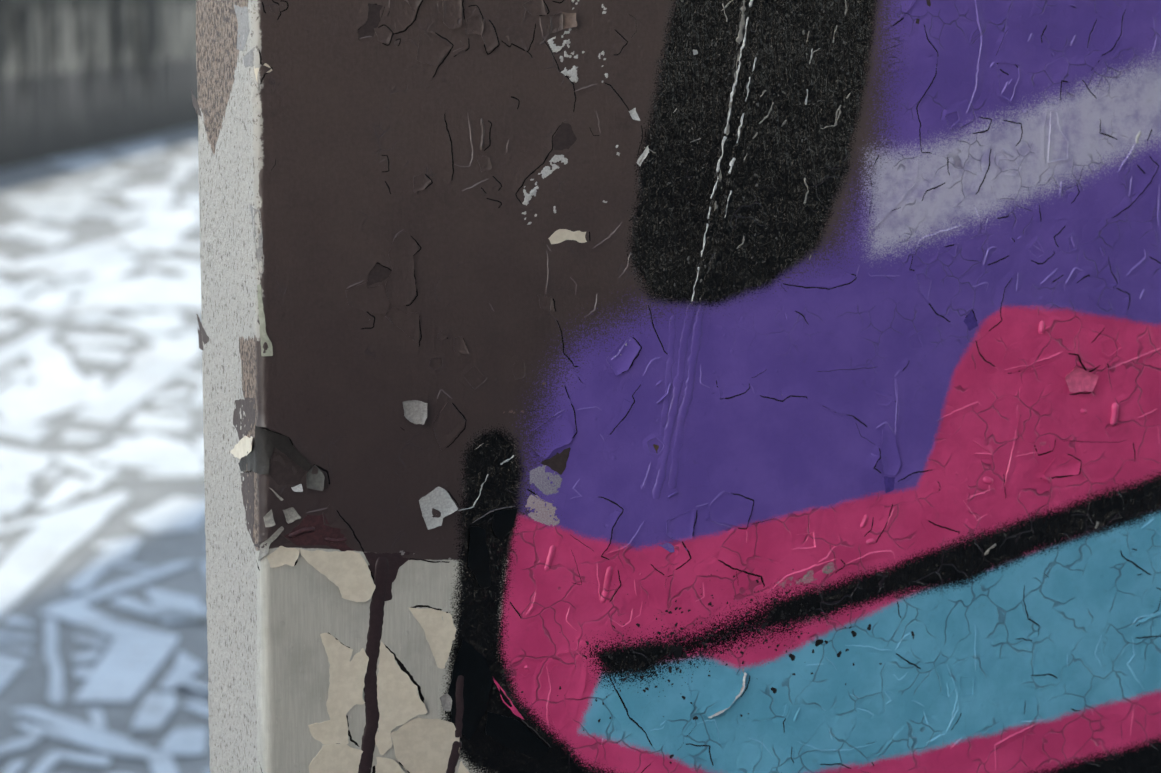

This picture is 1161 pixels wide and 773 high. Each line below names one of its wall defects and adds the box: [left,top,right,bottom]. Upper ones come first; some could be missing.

peeling [352,0,661,225]
crack [902,0,1161,376]
crack [503,303,911,445]
peeling [230,397,376,602]
crack [400,550,456,567]
peeling [419,487,459,530]
peeling [308,605,594,773]
peeling [468,398,576,588]
crack [458,443,720,773]
peeling [687,664,750,719]
crack [994,571,1104,770]
crack [1118,514,1161,594]